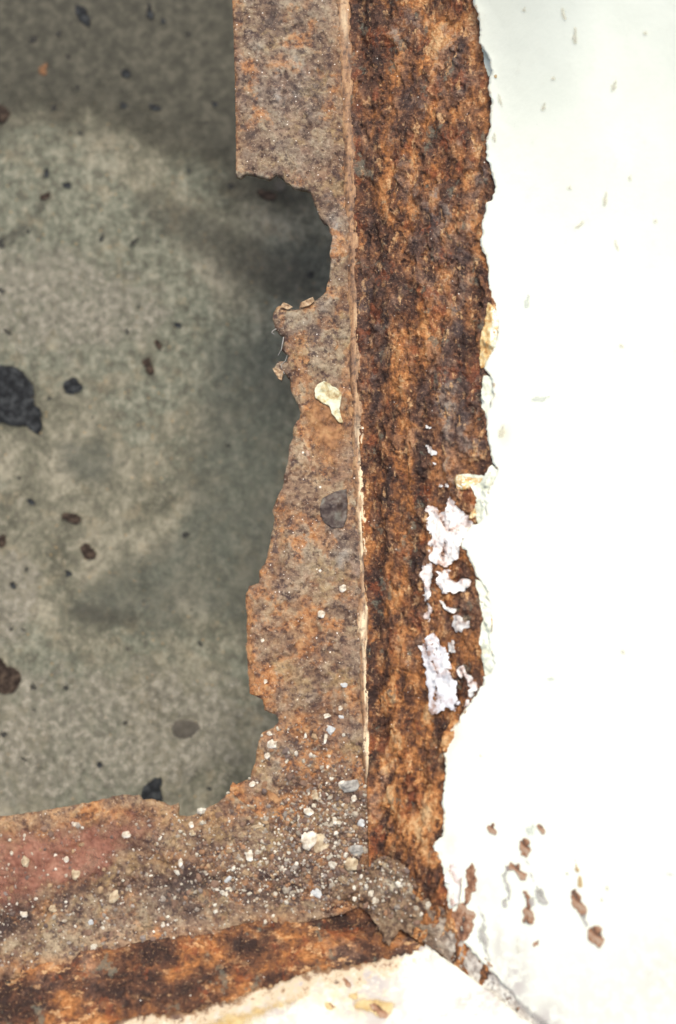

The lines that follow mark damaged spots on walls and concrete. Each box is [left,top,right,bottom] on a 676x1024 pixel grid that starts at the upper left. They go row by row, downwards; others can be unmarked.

corrosion [0,0,498,1024]
peeling [418,465,498,715]
corrosion [502,838,548,925]
corrosion [571,860,605,948]